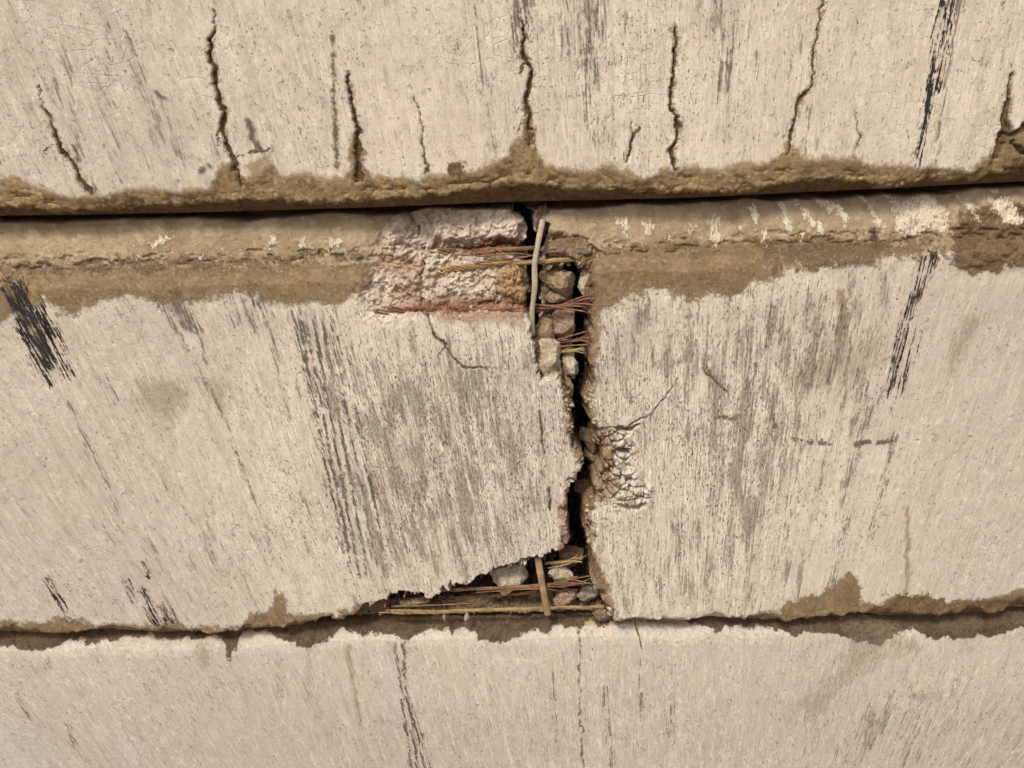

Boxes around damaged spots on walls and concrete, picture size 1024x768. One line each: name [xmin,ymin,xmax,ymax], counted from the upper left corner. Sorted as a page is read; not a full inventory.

crack [36,86,96,196]
crack [206,10,272,173]
crack [345,70,364,182]
water stain [0,0,1024,216]
crack [517,22,535,144]
crack [666,24,683,171]
crack [991,73,1024,159]
rust [371,233,532,327]
crack [513,202,677,551]
spalling [296,193,903,621]
peeling [143,498,259,613]
water stain [0,203,1024,768]